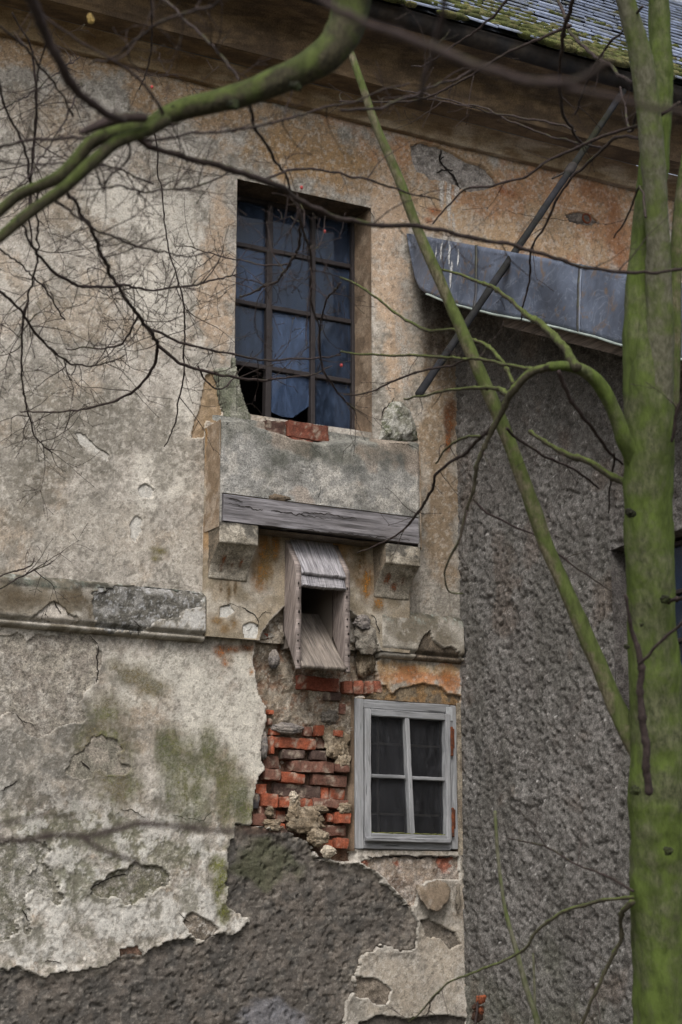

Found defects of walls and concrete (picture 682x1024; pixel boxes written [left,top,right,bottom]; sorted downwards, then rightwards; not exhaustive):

flaking render [410,143,495,192]
flaking render [565,212,596,226]
flaking render [191,374,221,438]
flaking render [0,586,203,738]
flaking render [0,614,465,1024]